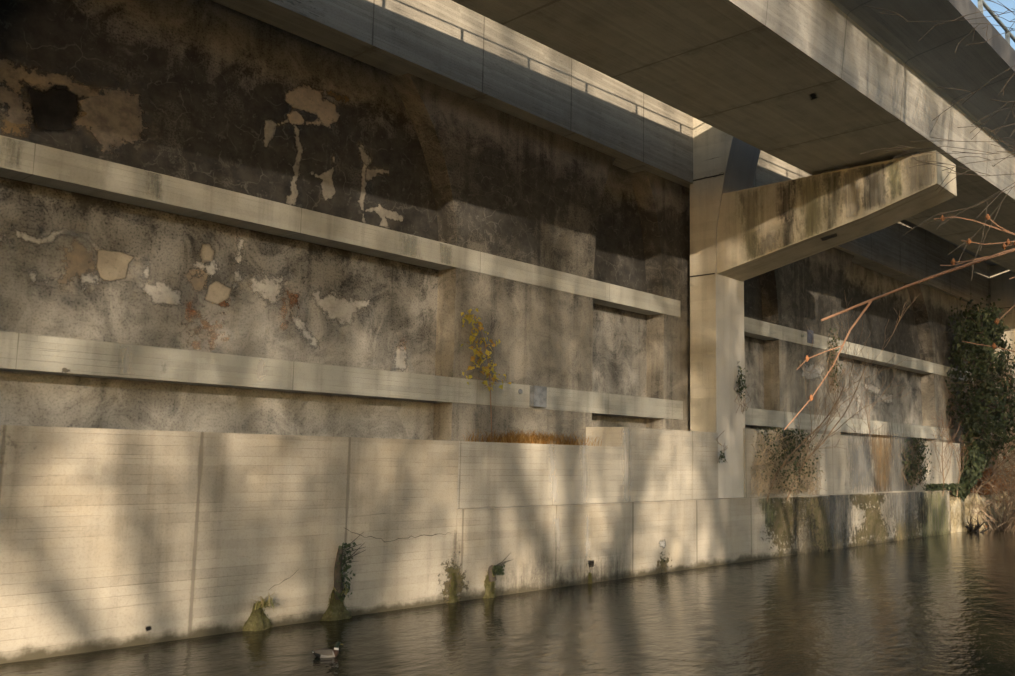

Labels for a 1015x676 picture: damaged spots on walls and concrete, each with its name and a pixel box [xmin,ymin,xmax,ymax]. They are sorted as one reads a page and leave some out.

flaking render [0,57,149,157]
flaking render [262,83,349,206]
damp [762,183,794,255]
damp [806,156,932,234]
flaking render [29,238,134,289]
flaking render [141,264,184,306]
flaking render [186,243,232,314]
flaking render [247,271,287,305]
flaking render [307,289,371,327]
damp [759,495,854,557]
damp [888,492,950,541]